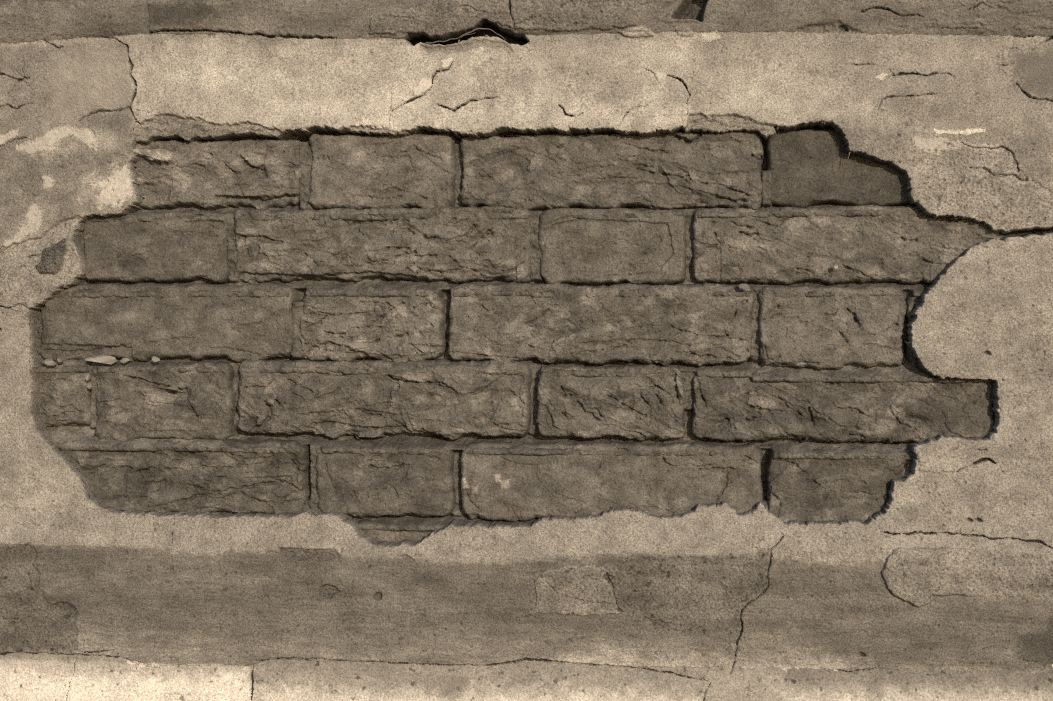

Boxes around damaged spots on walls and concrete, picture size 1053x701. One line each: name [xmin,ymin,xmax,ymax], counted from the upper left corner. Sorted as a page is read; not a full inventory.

crack [150,29,334,39]
crack [861,2,987,29]
crack [0,62,35,109]
crack [80,37,149,136]
crack [389,64,495,124]
crack [854,64,953,110]
crack [995,35,1053,102]
spalling [0,111,1053,563]
crack [884,531,1053,549]